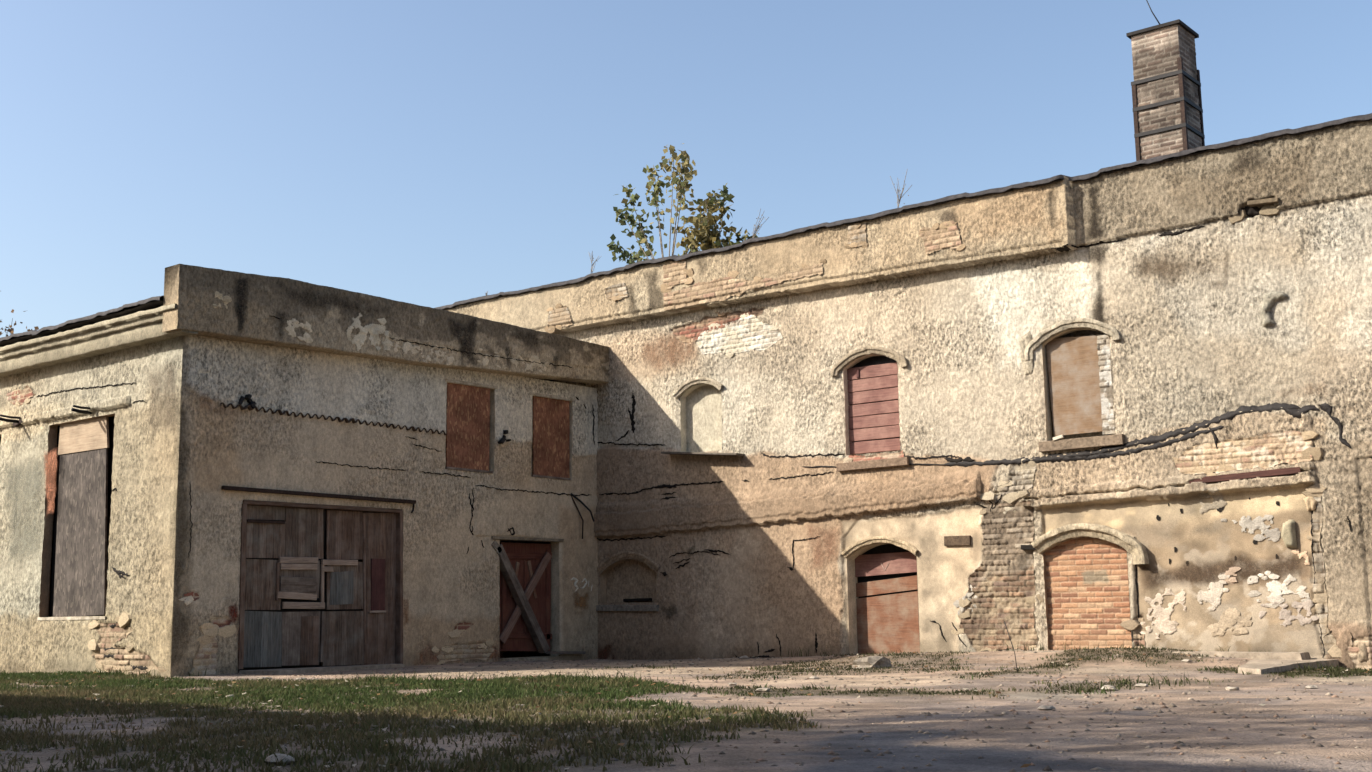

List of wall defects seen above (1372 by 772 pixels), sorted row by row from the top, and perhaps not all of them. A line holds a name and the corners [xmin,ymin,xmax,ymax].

spalling [845,222,869,249]
leakage [450,320,477,359]
spalling [661,259,827,358]
crack [389,337,665,446]
crack [316,436,843,553]
crack [597,535,728,576]
crack [787,536,820,571]
spalling [951,459,1047,652]
spalling [1120,430,1372,670]
spalling [87,612,166,675]